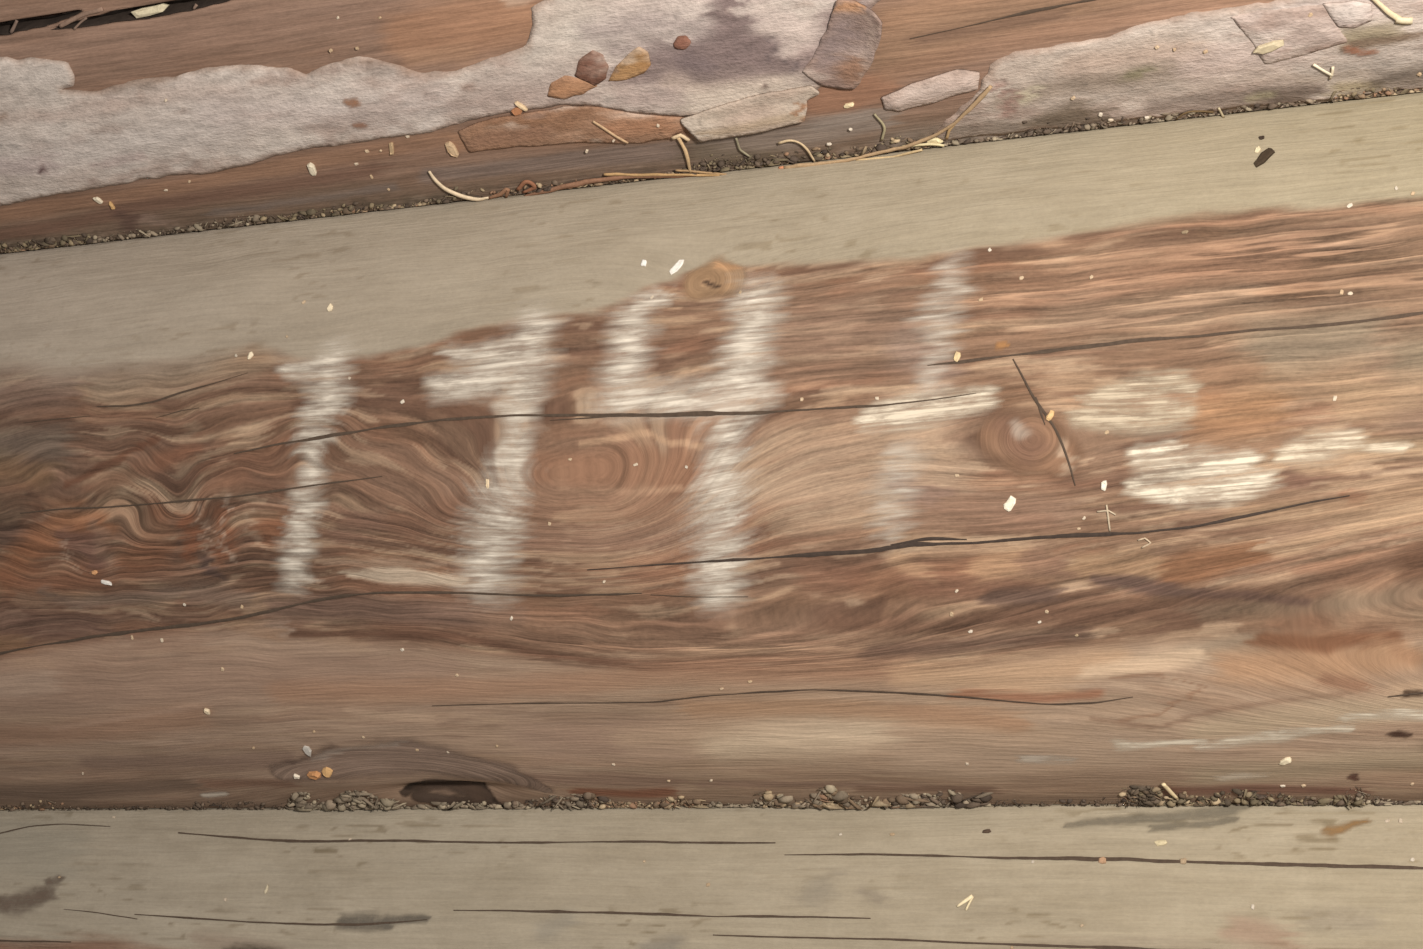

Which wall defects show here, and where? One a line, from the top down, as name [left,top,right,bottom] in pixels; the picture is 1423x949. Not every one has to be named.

crack [0,0,230,35]
peeling [673,35,691,50]
peeling [803,0,883,89]
peeling [458,47,686,153]
crack [234,311,1423,486]
crack [20,476,382,514]
crack [0,495,1350,655]
crack [432,689,1132,706]
crack [0,824,110,834]
crack [178,832,1423,869]
crack [0,909,1156,949]